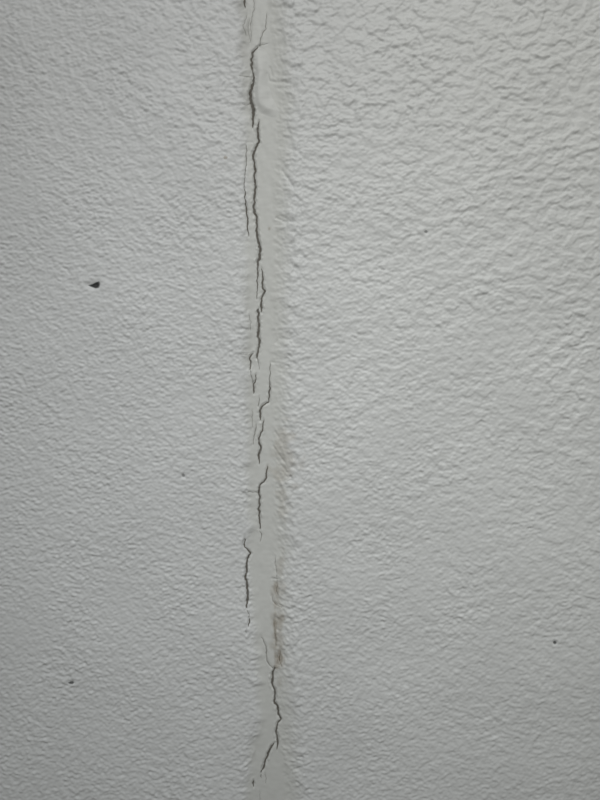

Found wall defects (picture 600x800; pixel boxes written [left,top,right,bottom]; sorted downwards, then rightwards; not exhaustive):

crack [244,47,271,626]
crack [252,667,281,786]